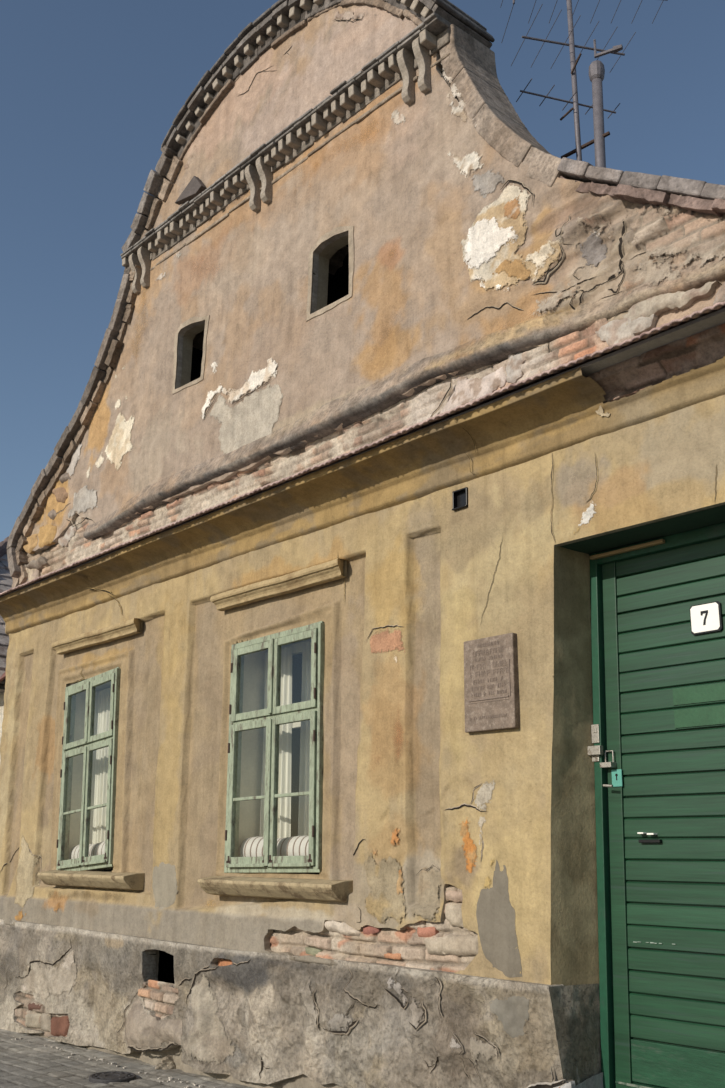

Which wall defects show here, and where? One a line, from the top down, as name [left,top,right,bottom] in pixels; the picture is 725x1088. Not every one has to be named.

peeling [447,152,485,178]
peeling [461,179,581,322]
crack [468,209,688,319]
flaking render [25,205,725,583]
crack [549,455,557,543]
crack [586,452,599,503]
crack [481,534,503,622]
spalling [15,950,78,1037]
spalling [138,973,237,1064]
crack [322,967,378,1031]
flaking render [269,885,478,1036]
crack [527,1067,566,1088]